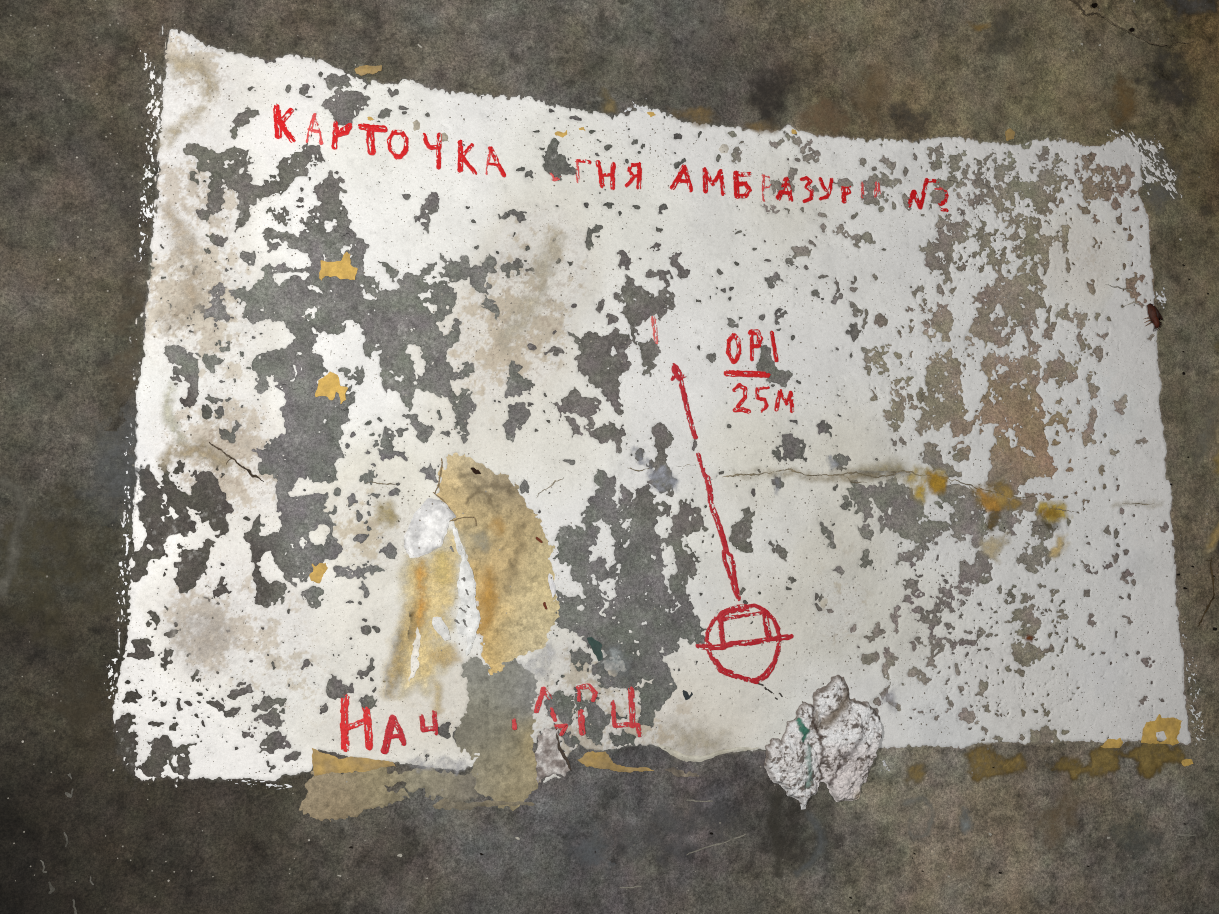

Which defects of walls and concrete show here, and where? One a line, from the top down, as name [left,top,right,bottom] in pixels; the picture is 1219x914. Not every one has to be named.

crack [1072,0,1194,47]
peeling [716,131,744,164]
peeling [696,261,739,303]
peeling [735,131,1173,744]
peeling [115,107,714,822]
crack [723,468,1074,512]
peeling [729,485,756,553]